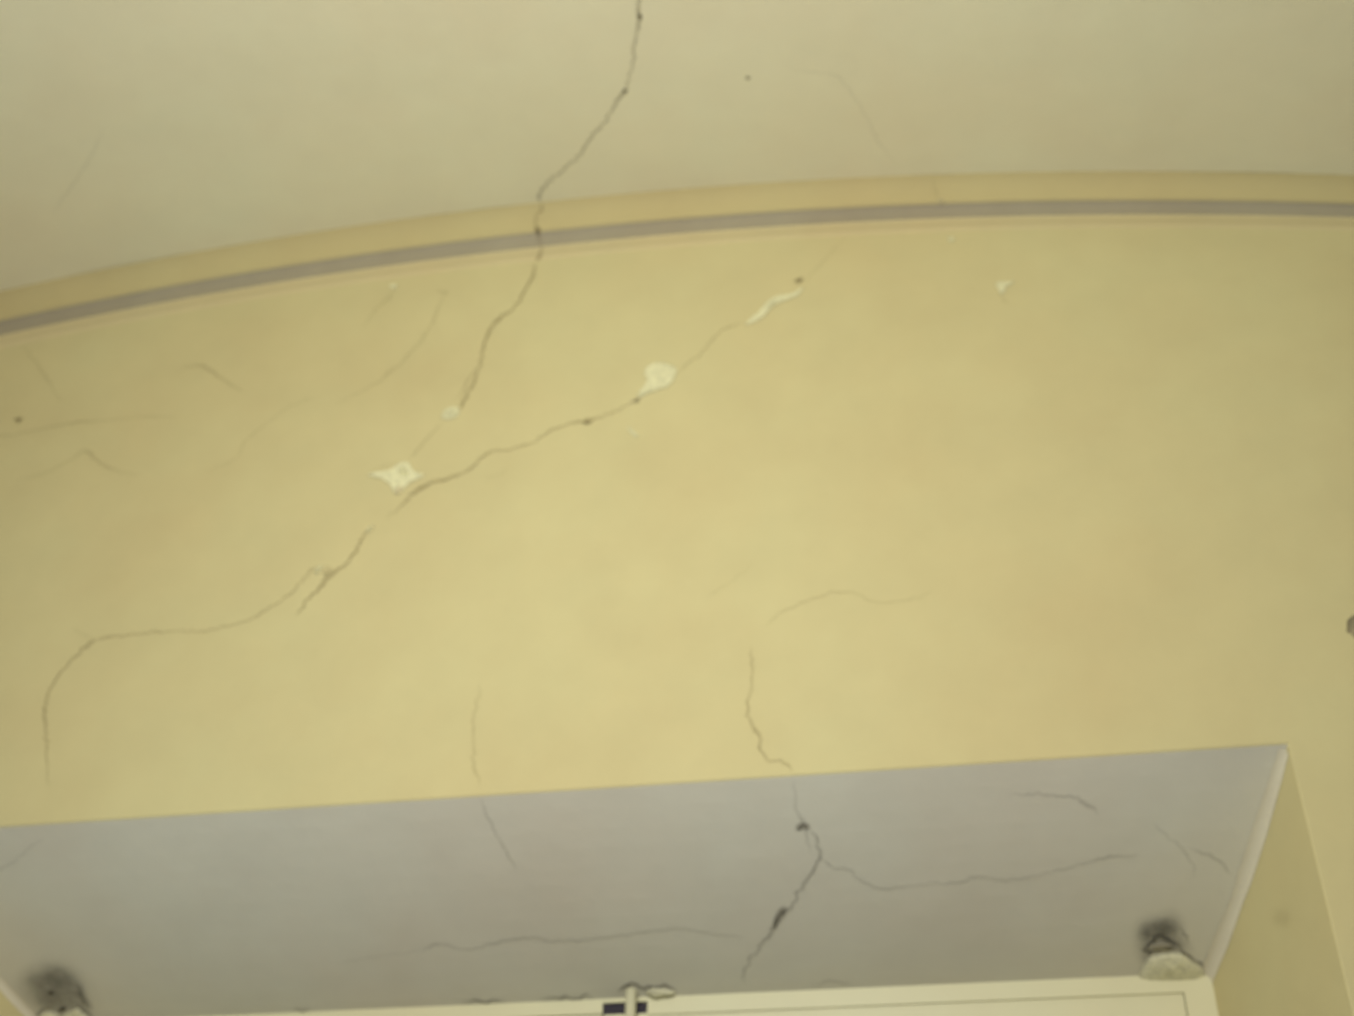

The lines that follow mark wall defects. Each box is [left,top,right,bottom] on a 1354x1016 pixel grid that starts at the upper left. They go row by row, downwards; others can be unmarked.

peeling [629,362,677,403]
peeling [368,462,424,494]